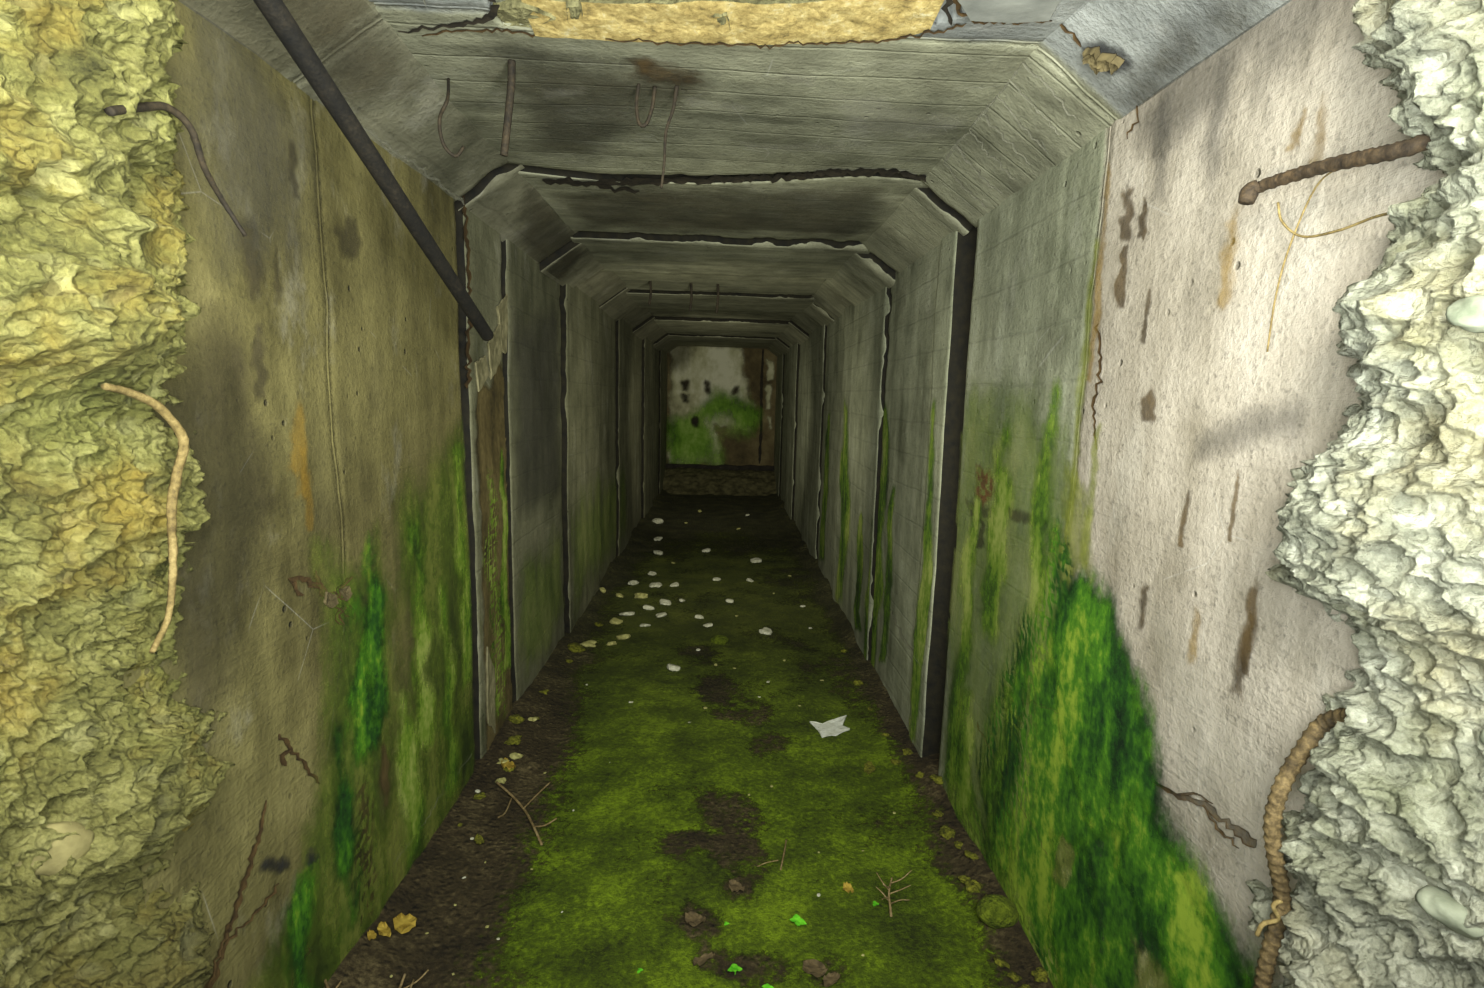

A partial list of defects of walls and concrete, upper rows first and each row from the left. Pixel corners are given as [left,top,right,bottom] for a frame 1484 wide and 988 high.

spalling [398,0,966,49]
spalling [1082,43,1130,75]
crack [542,168,927,194]
corrosion [1114,190,1147,307]
corrosion [1141,391,1155,420]
water stain [1029,385,1060,612]
corrosion [1228,476,1239,541]
water stain [332,445,472,924]
water stain [943,428,1027,882]
corrosion [1235,588,1257,690]
water stain [1048,576,1248,988]
crack [1156,783,1257,848]